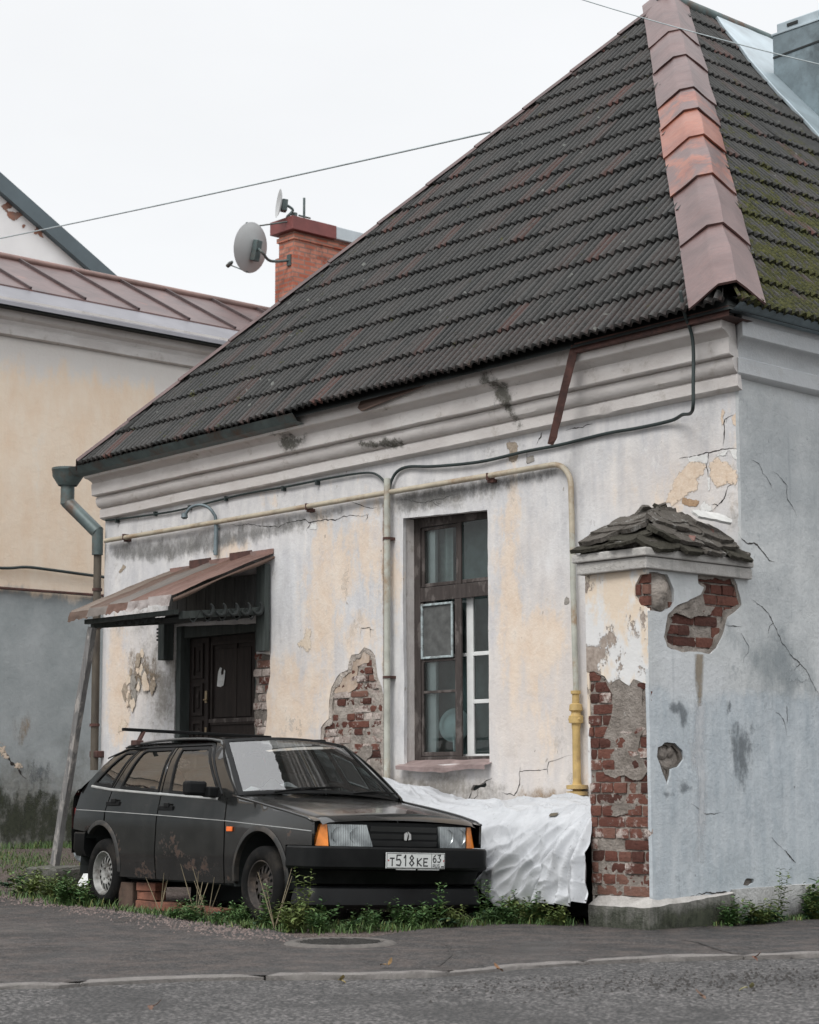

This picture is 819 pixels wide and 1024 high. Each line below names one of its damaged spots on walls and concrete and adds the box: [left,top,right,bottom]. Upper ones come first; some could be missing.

damp [480,373,520,427]
peeling [666,449,738,512]
crack [683,415,795,511]
damp [115,519,297,559]
crack [233,502,373,531]
spalling [636,572,741,654]
crack [724,600,819,694]
peeling [122,649,156,712]
spalling [321,648,383,777]
crack [468,757,563,799]
spalling [588,671,682,897]